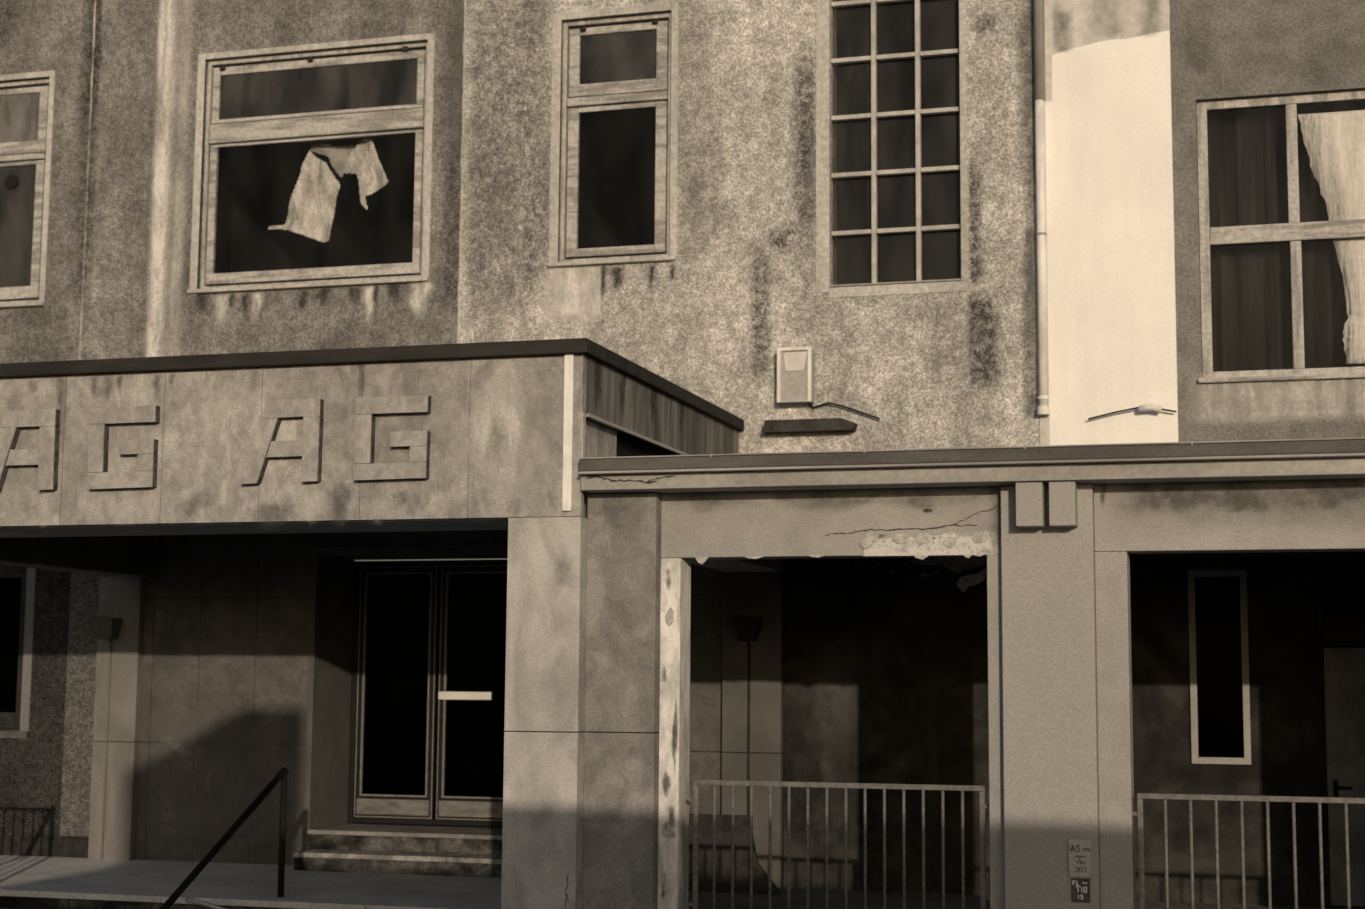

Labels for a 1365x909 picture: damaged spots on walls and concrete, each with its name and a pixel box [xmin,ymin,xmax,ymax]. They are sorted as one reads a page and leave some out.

damp [752,60,814,371]
crack [826,500,1001,536]
flaking render [855,531,998,592]